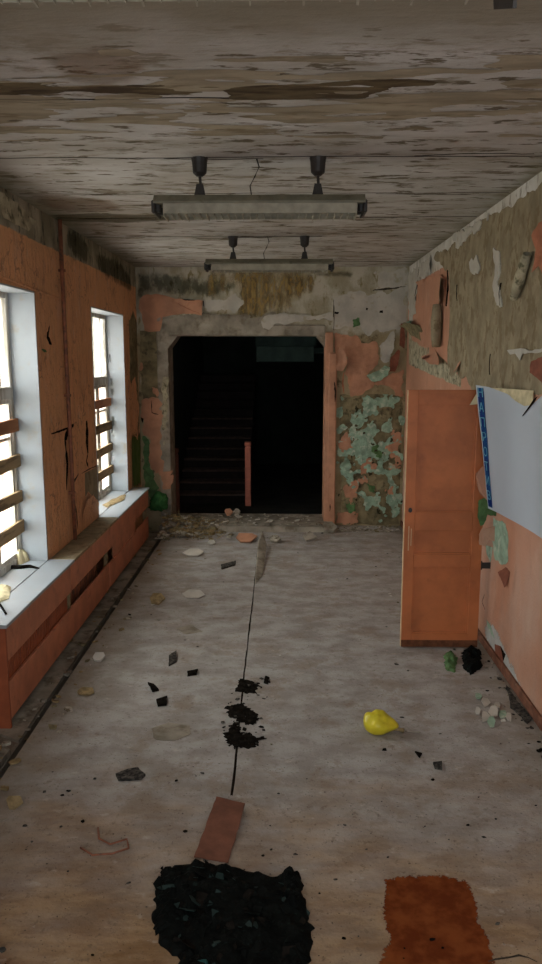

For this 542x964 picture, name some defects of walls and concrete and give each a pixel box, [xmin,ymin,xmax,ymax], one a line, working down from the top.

peeling [129,182,542,525]
peeling [476,466,510,587]